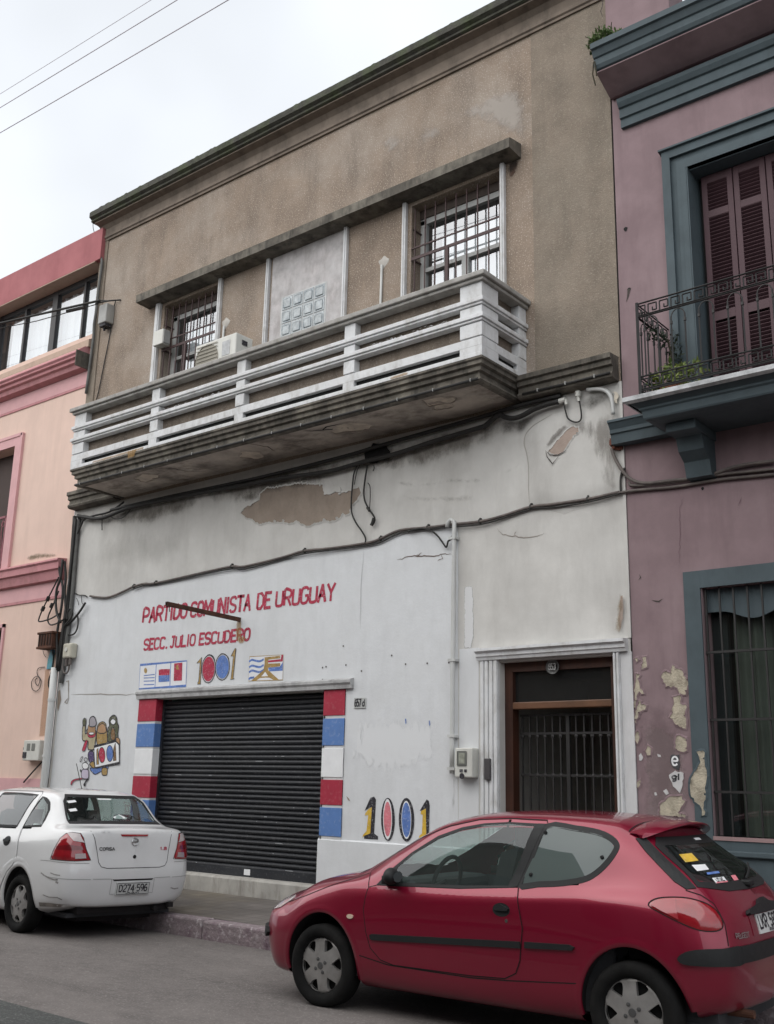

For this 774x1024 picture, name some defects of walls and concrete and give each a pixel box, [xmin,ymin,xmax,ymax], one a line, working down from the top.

spalling [546,425,580,464]
peeling [240,481,362,528]
peeling [633,655,653,757]
peeling [657,663,709,819]